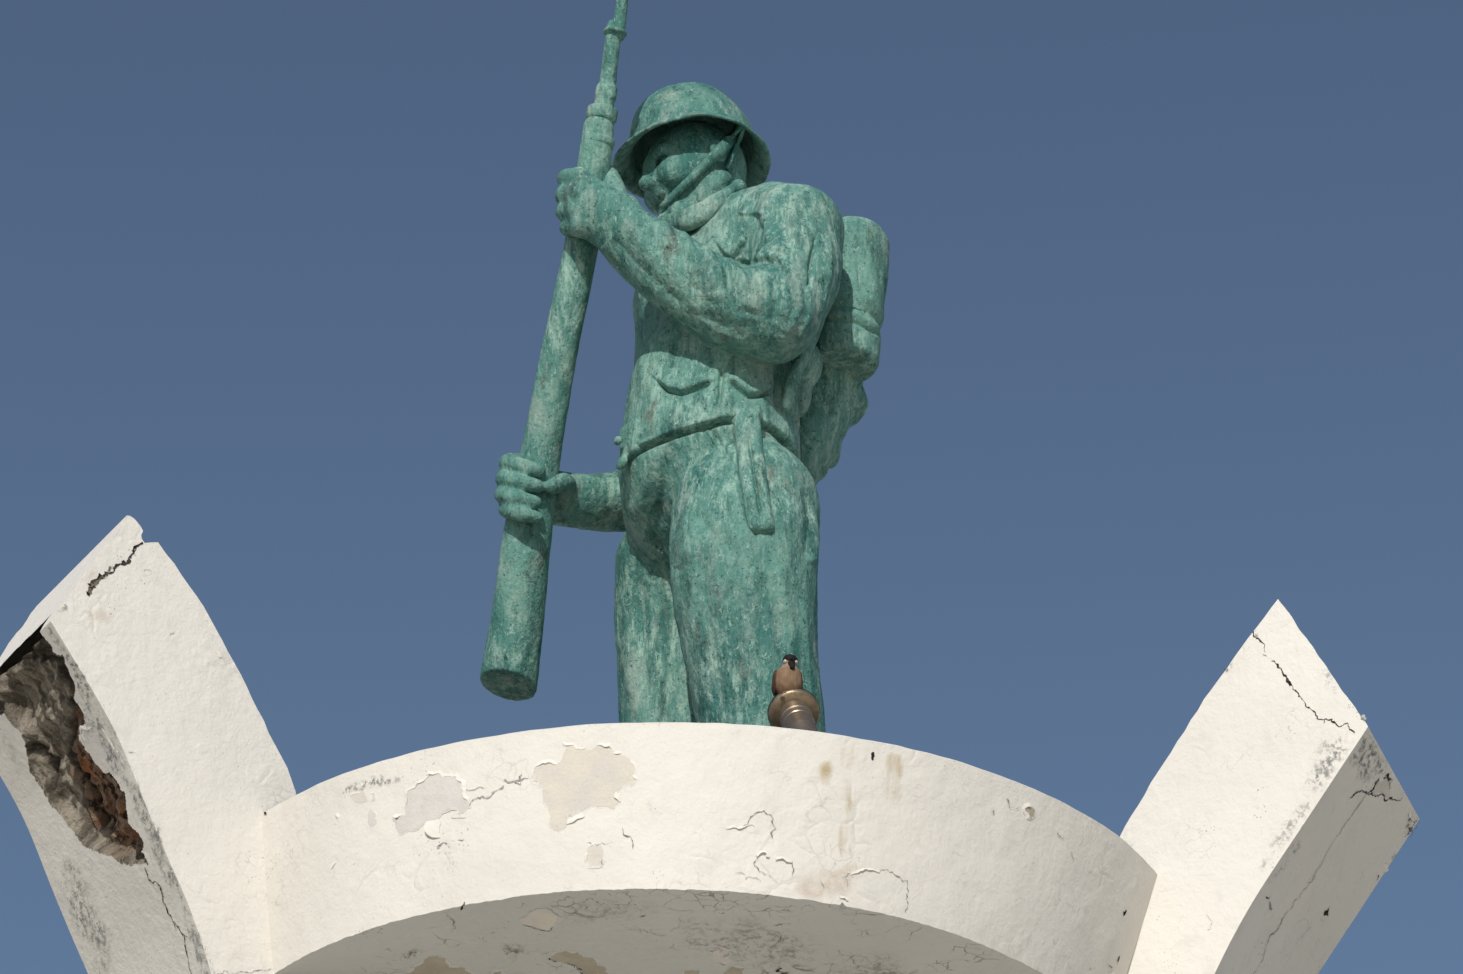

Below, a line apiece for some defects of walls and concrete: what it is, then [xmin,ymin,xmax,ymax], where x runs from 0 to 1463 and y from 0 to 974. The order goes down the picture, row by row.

crack [86,542,143,596]
crack [1253,631,1355,732]
spalling [0,616,148,866]
peeling [333,771,472,848]
peeling [530,742,639,834]
crack [1258,790,1367,967]
peeling [405,955,475,974]
peeling [547,950,610,974]